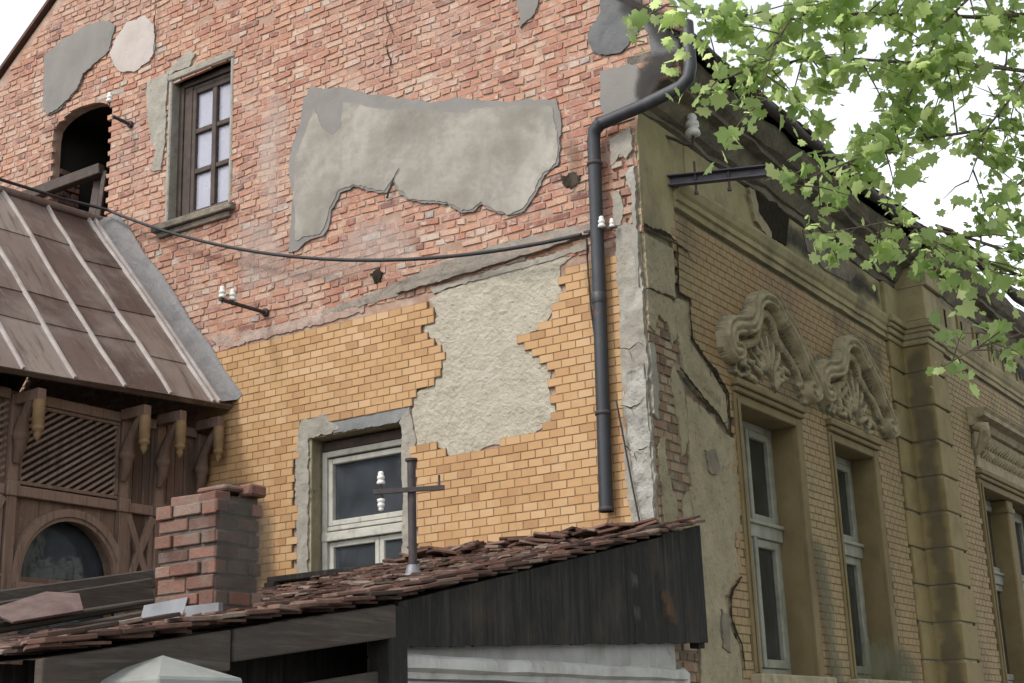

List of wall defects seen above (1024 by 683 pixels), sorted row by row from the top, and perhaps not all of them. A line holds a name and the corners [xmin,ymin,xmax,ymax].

flaking render [42,15,156,116]
crack [385,3,395,76]
flaking render [587,0,682,115]
flaking render [288,86,581,253]
spalling [382,126,695,563]
crack [726,576,745,670]